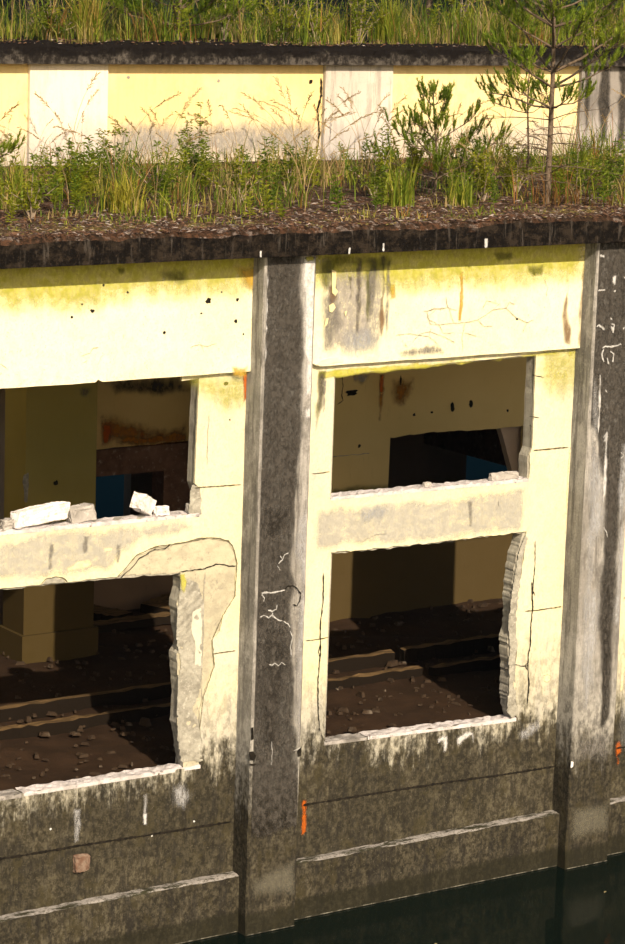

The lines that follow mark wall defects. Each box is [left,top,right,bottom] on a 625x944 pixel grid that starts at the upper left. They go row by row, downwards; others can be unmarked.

rust [396,381,411,403]
crack [398,298,532,351]
rust [563,297,571,343]
leakage [251,243,390,836]
leakage [319,491,522,547]
leakage [583,242,625,755]
spalling [118,537,238,767]
crack [261,553,328,731]
spalling [507,536,528,718]
crack [515,541,561,703]
leakage [249,851,625,935]